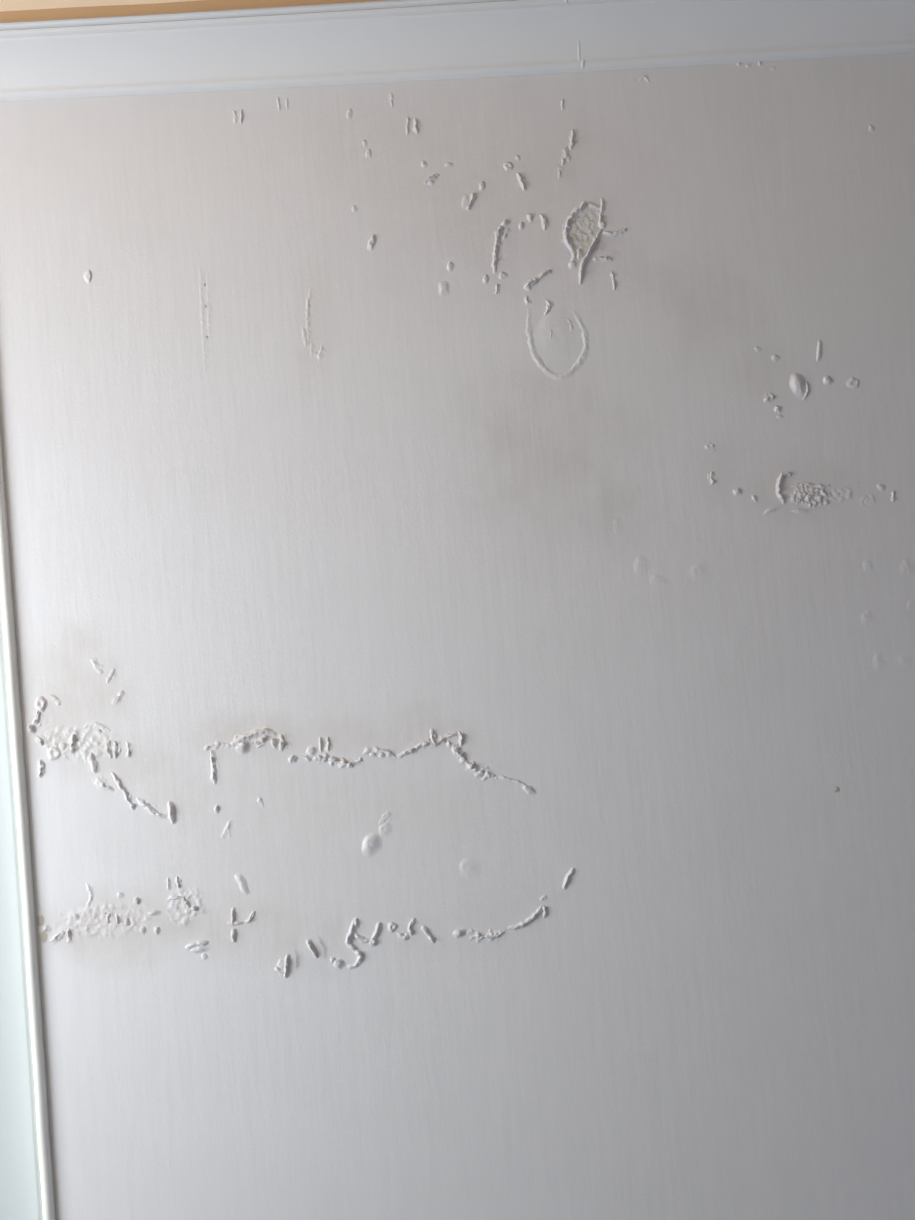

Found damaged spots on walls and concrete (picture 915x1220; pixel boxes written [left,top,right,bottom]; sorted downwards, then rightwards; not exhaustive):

peeling [503,155,529,192]
peeling [482,197,628,294]
peeling [562,867,576,890]
peeling [305,938,320,959]
peeling [273,954,292,978]